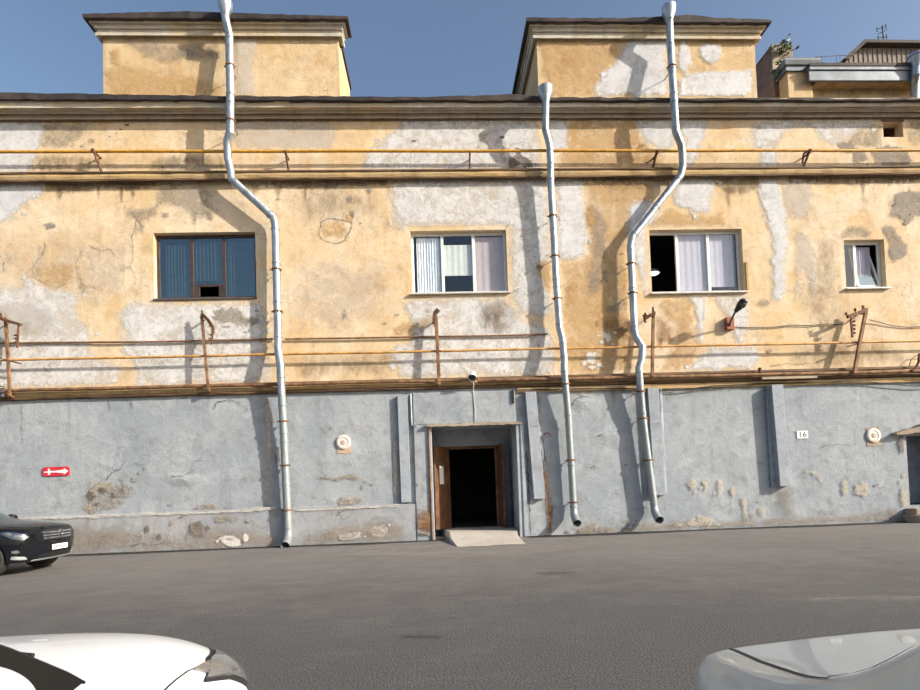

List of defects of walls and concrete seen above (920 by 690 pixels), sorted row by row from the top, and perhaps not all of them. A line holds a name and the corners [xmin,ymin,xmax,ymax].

peeling [678,40,692,76]
crack [3,215,143,292]
peeling [18,399,279,548]
peeling [676,516,721,526]